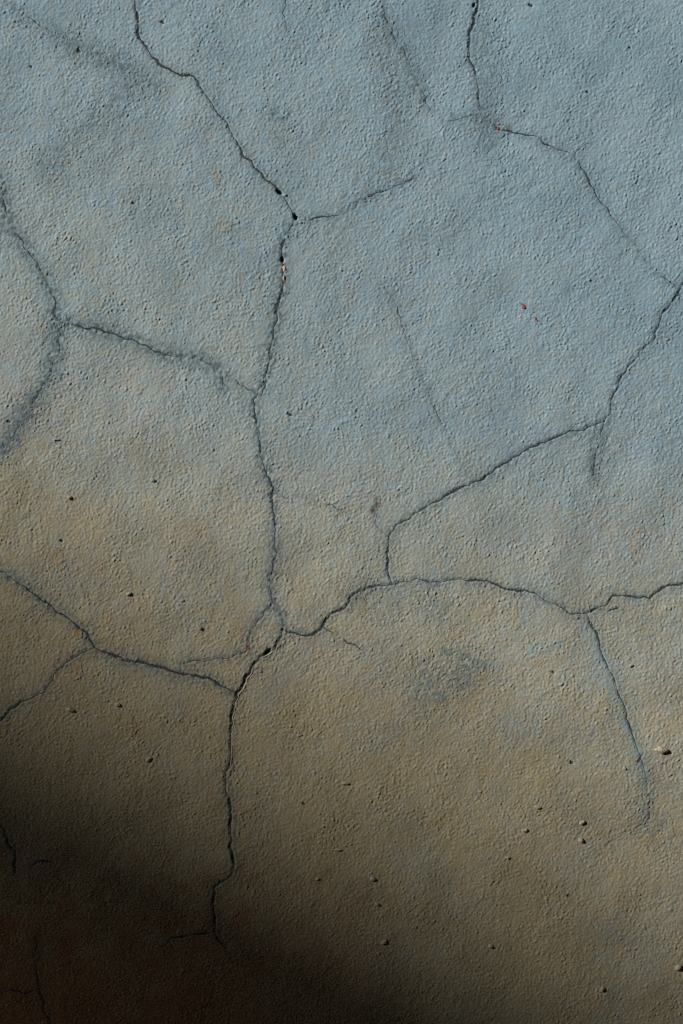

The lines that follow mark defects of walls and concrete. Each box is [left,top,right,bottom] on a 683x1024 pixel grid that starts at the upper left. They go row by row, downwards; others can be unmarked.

crack [1,188,171,412]
crack [134,0,337,629]
crack [0,273,683,954]
crack [449,0,642,256]